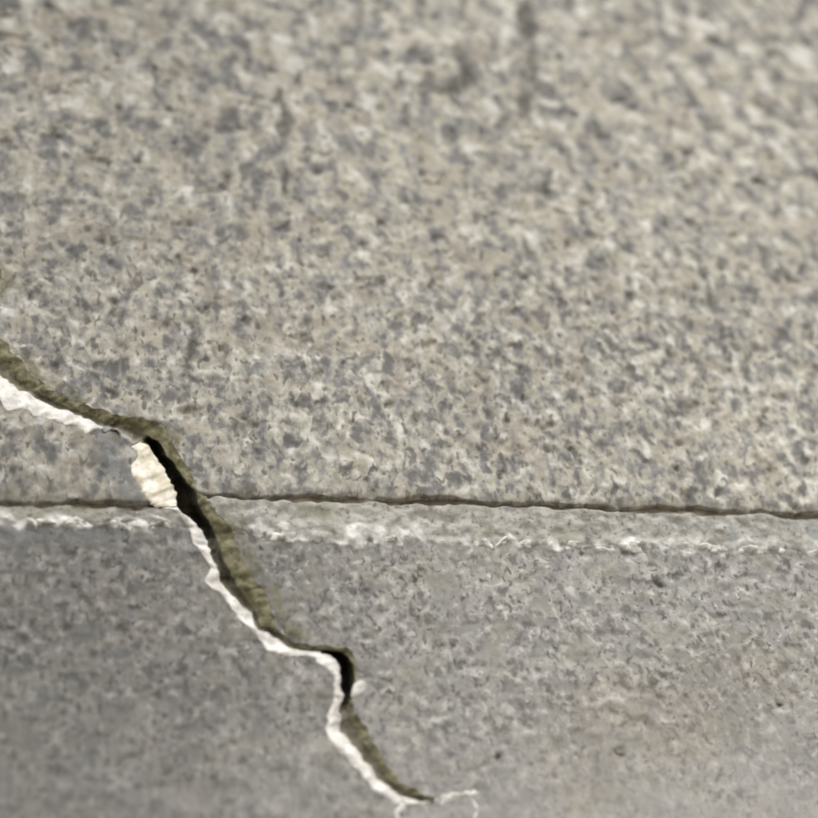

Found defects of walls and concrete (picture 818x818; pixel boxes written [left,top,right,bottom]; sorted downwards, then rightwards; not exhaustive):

crack [0,338,479,818]